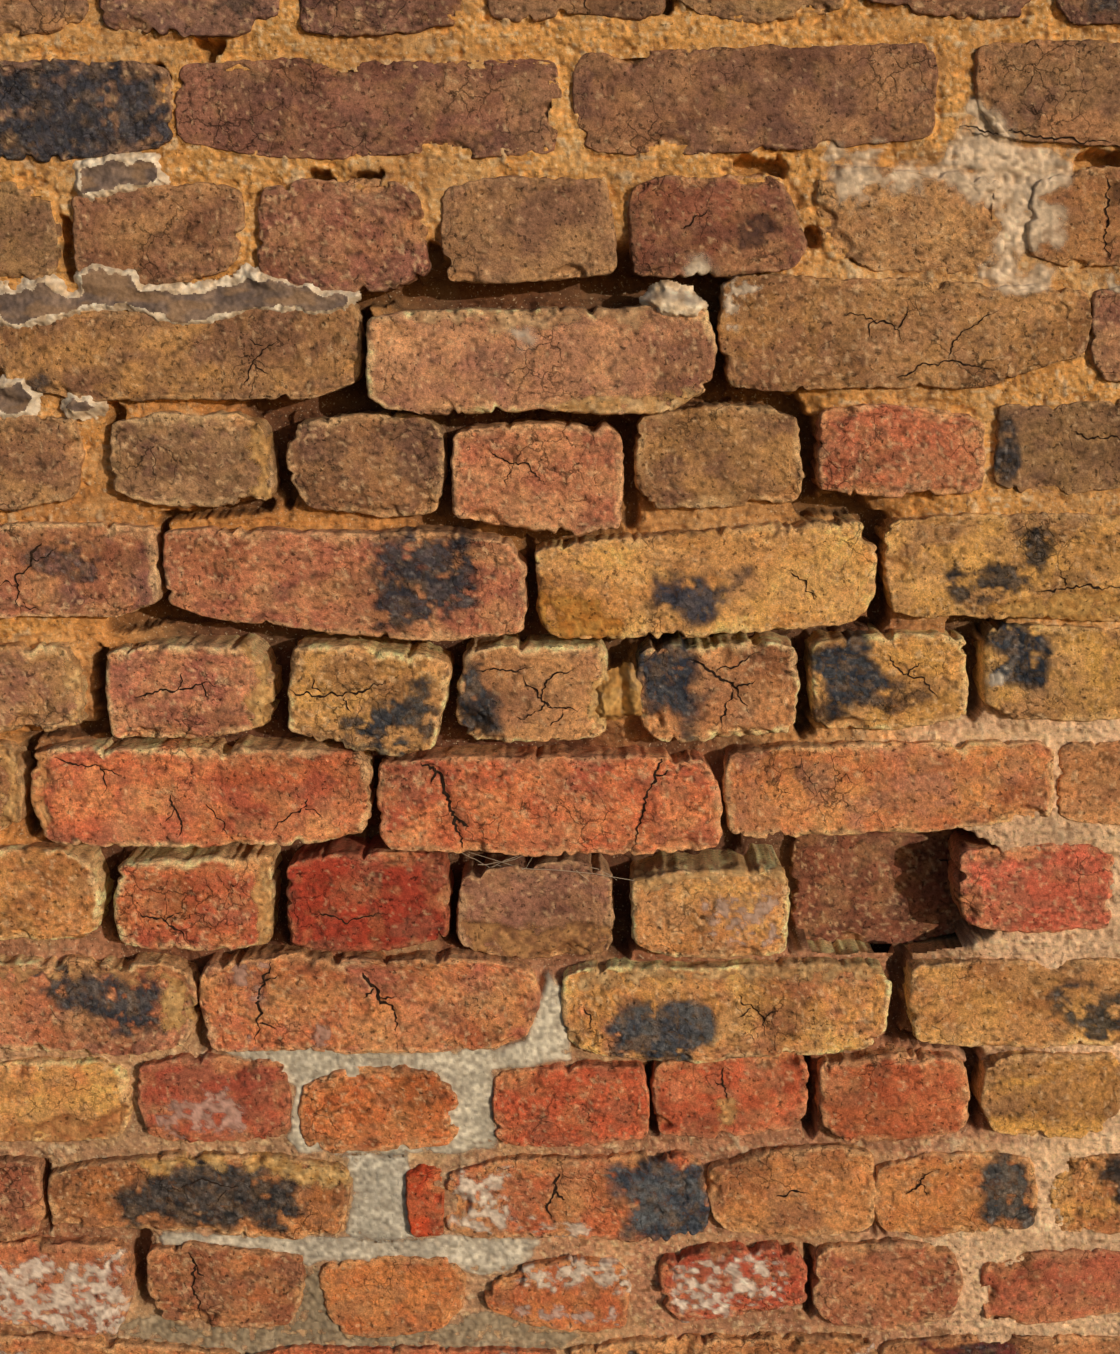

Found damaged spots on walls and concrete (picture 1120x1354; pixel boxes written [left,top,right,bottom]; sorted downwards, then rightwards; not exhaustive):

crack [846,307,1001,378]
crack [136,673,216,699]
crack [476,667,583,726]
crack [55,757,122,795]
crack [166,795,227,836]
crack [420,762,469,848]
crack [631,759,668,852]
crack [254,962,279,1044]
crack [362,973,398,1031]
crack [545,1173,565,1219]
water stain [0,1250,130,1333]
water stain [671,1253,786,1323]